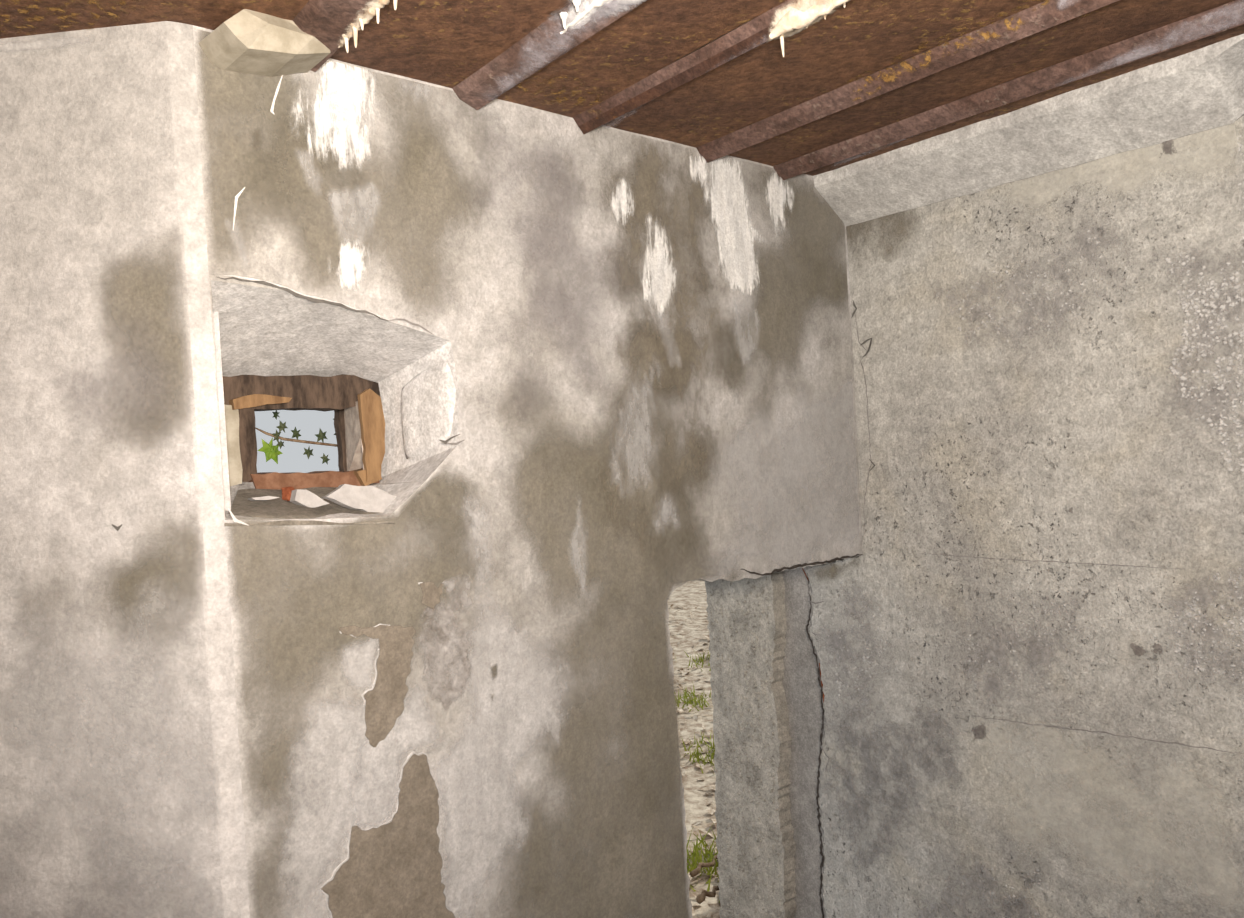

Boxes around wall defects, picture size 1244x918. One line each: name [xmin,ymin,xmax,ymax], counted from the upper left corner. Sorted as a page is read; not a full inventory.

leakage [558,0,646,43]
leakage [769,0,850,41]
leakage [200,0,475,304]
leakage [107,259,185,430]
peeling [339,581,472,747]
crack [740,291,876,918]
peeling [319,751,455,918]